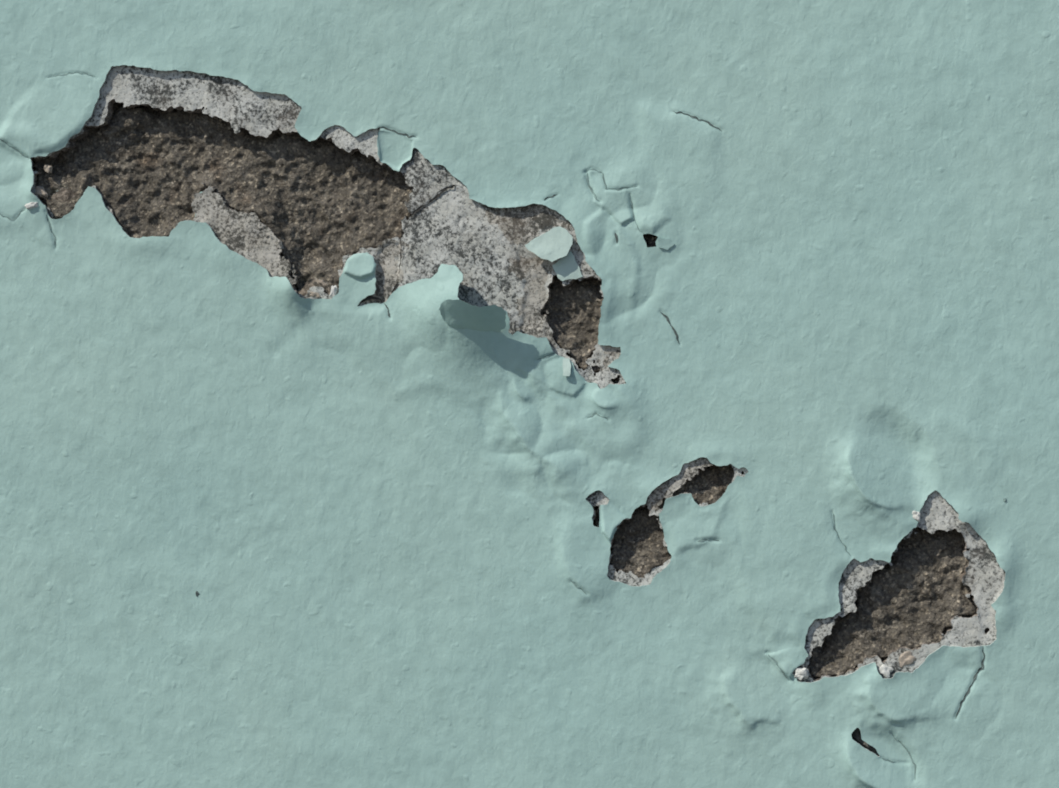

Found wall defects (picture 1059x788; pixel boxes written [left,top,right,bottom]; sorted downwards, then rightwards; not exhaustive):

spalling [0,65,674,397]
crack [675,111,720,130]
spalling [586,457,1005,682]
crack [955,649,985,718]